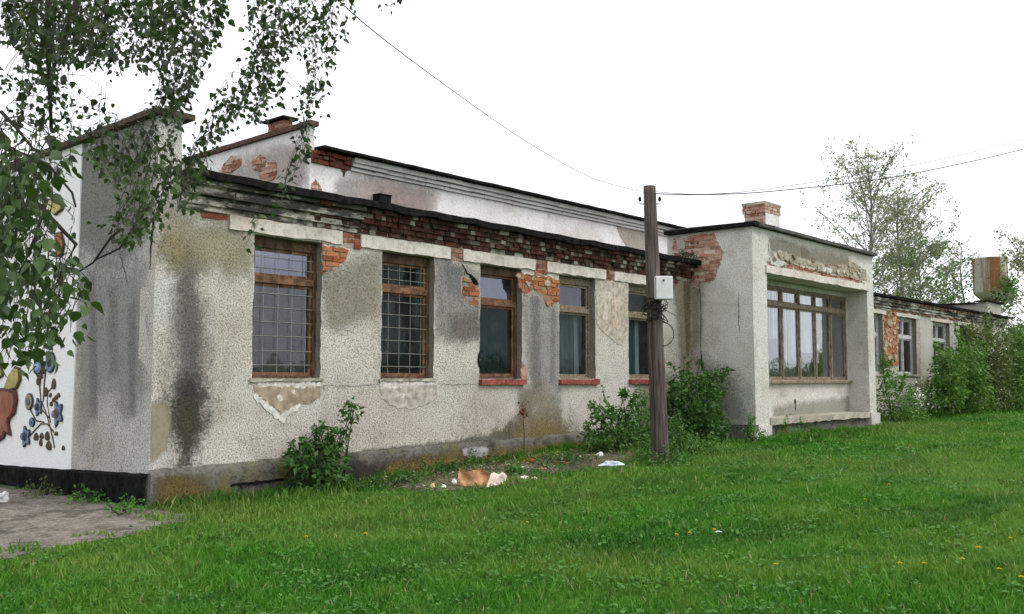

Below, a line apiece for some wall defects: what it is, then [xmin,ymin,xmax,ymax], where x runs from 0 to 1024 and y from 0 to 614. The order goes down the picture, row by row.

flaking render [219,155,277,181]
flaking render [321,231,361,276]
flaking render [461,274,480,307]
flaking render [515,260,560,309]
flaking render [669,231,725,291]
flaking render [767,250,867,291]
damp [80,263,145,422]
damp [164,258,209,465]
flaking render [883,310,900,368]
flaking render [253,381,321,423]
damp [346,295,561,480]